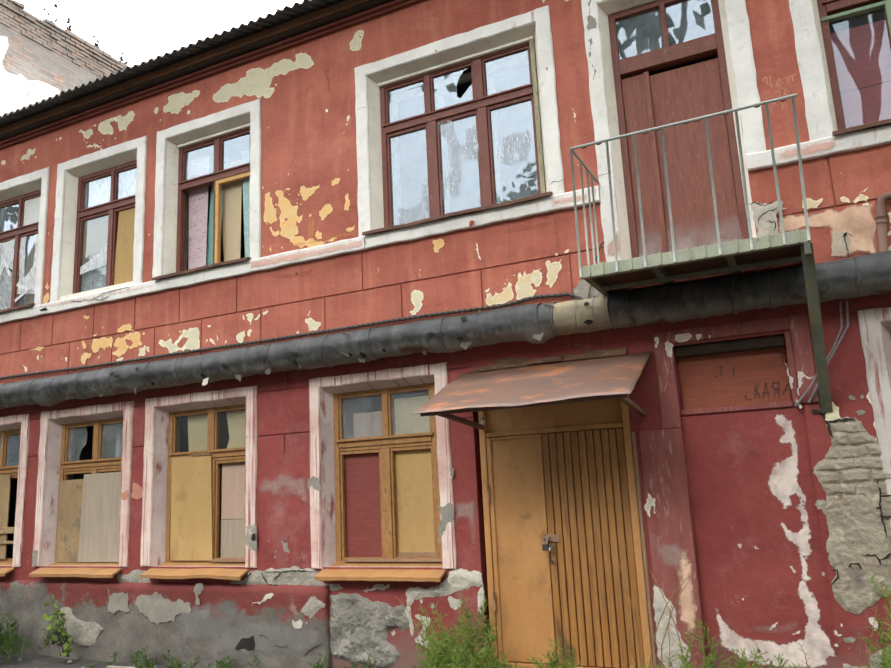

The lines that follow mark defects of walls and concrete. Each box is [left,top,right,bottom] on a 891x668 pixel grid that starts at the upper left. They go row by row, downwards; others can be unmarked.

peeling [587,0,597,80]
peeling [213,53,314,103]
peeling [262,183,355,252]
peeling [478,249,570,313]
flaking render [573,280,615,300]
peeling [77,311,268,365]
flaking render [813,392,891,631]
flaking render [51,607,103,646]
peeling [108,569,204,625]
flaking render [229,541,483,668]
flaking render [653,585,692,668]